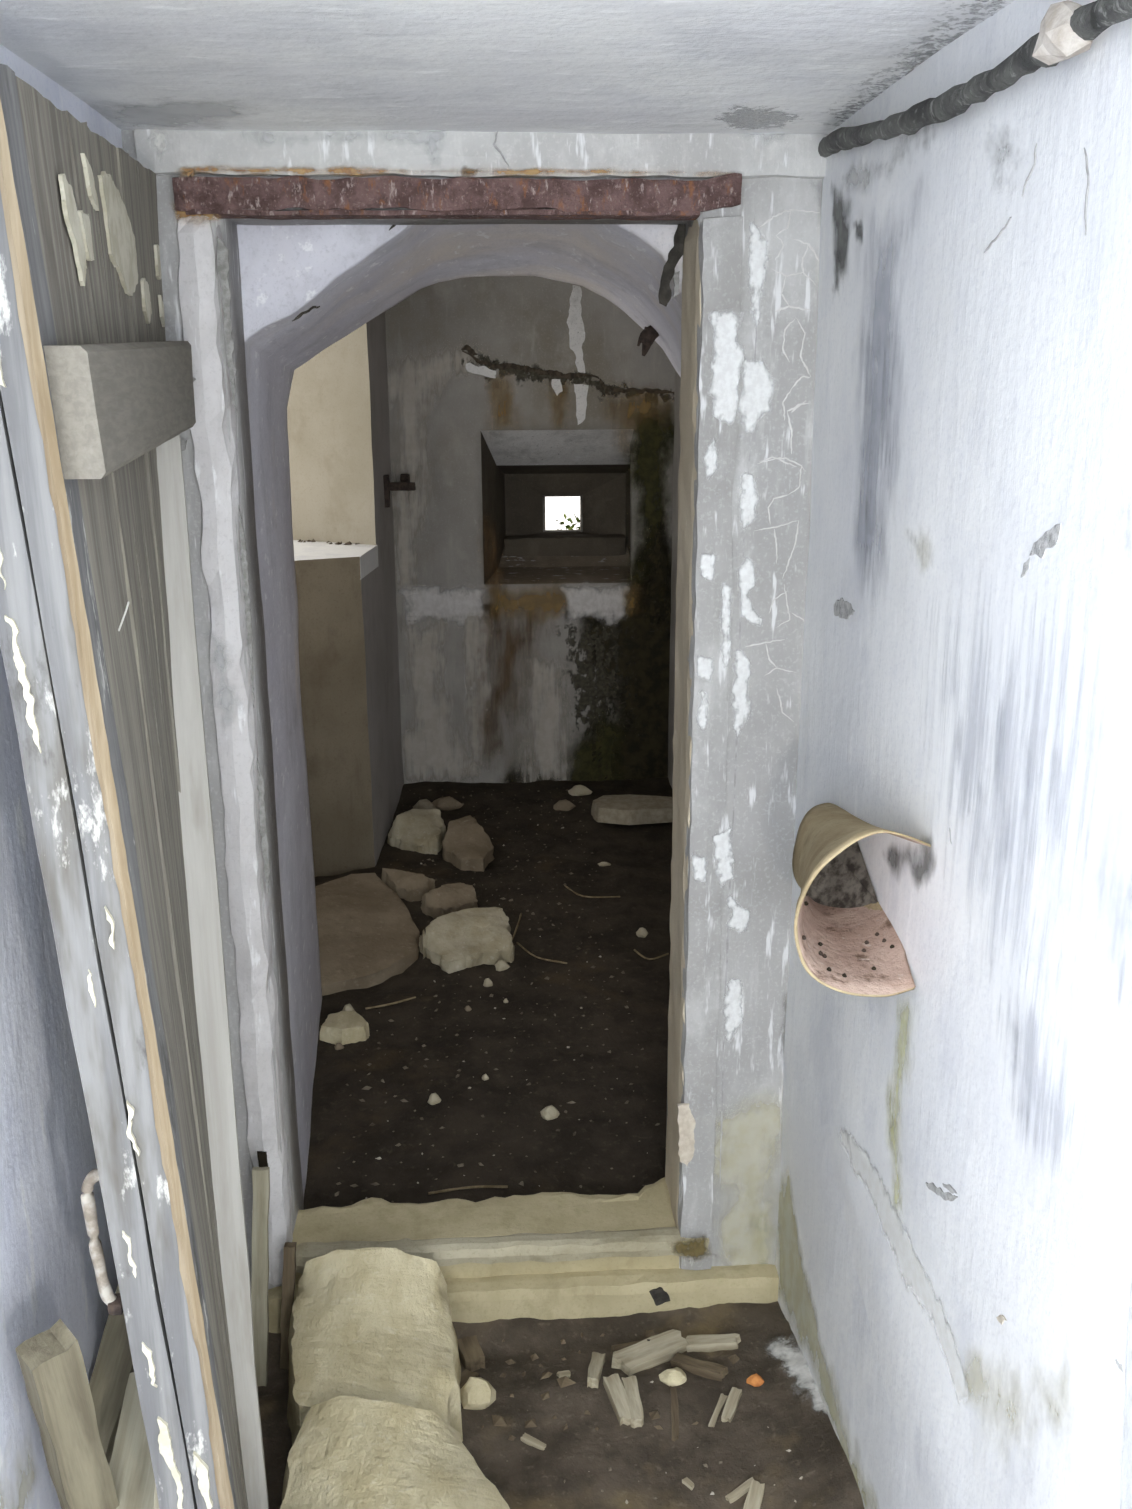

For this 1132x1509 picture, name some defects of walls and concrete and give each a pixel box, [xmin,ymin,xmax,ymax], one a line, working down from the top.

rust [182,167,403,177]
peeling [58,153,165,327]
flaking render [466,363,496,378]
flaking render [709,223,773,432]
flaking render [704,440,717,475]
flaking render [740,474,758,528]
spalling [1020,523,1062,578]
water stain [463,616,493,770]
water stain [564,524,671,781]
flaking render [697,554,762,737]
flaking render [692,828,749,932]
flaking render [724,979,742,1042]